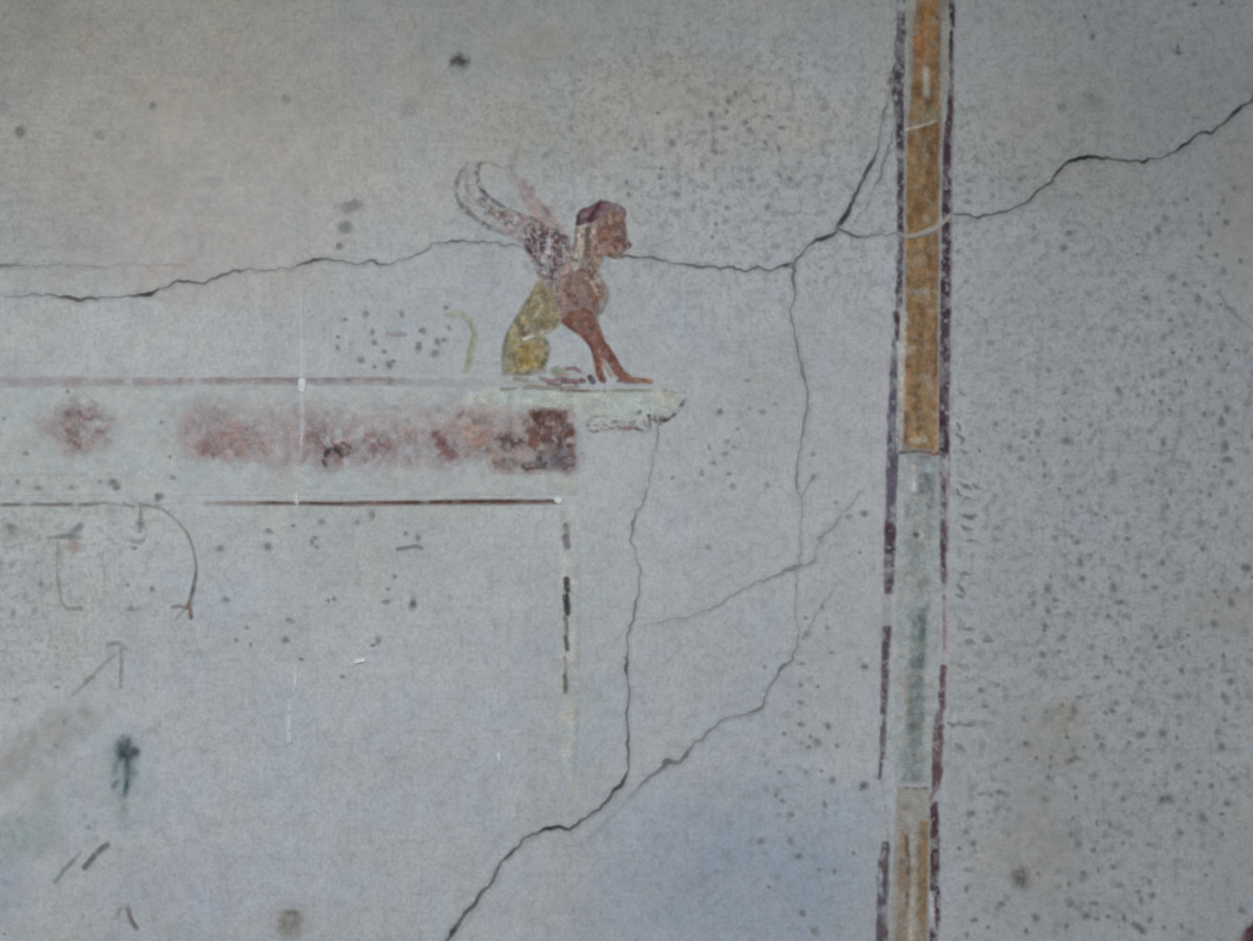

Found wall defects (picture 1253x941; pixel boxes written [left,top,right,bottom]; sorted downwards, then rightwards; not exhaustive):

crack [29,239,512,302]
crack [619,94,1253,490]
crack [630,495,646,542]
crack [684,525,835,619]
crack [444,591,808,941]